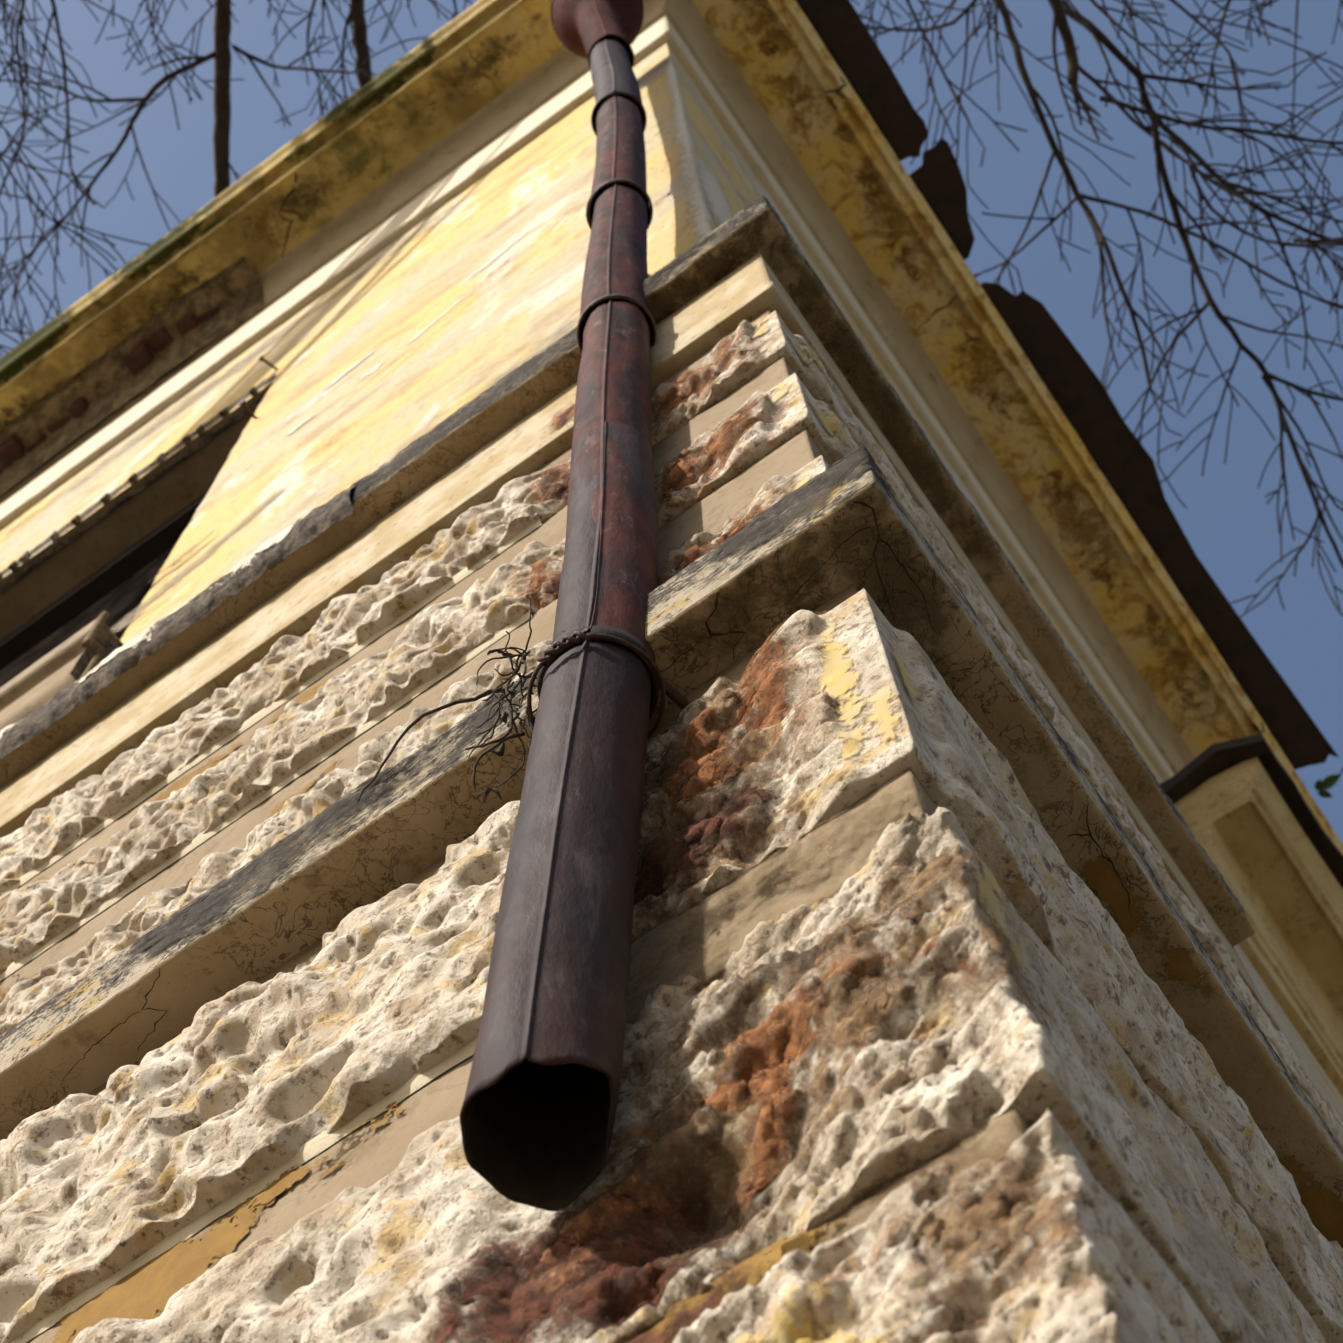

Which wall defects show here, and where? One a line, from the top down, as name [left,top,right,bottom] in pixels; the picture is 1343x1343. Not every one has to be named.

leakage [349,320,577,503]
rust [654,394,791,521]
spalling [0,485,357,761]
leakage [112,489,283,631]
rust [658,486,792,583]
crack [787,501,940,638]
peeling [147,734,254,803]
peeling [266,756,341,819]
leakage [81,665,544,995]
rust [635,627,821,906]
crack [62,968,167,1082]
rust [426,843,1100,1343]